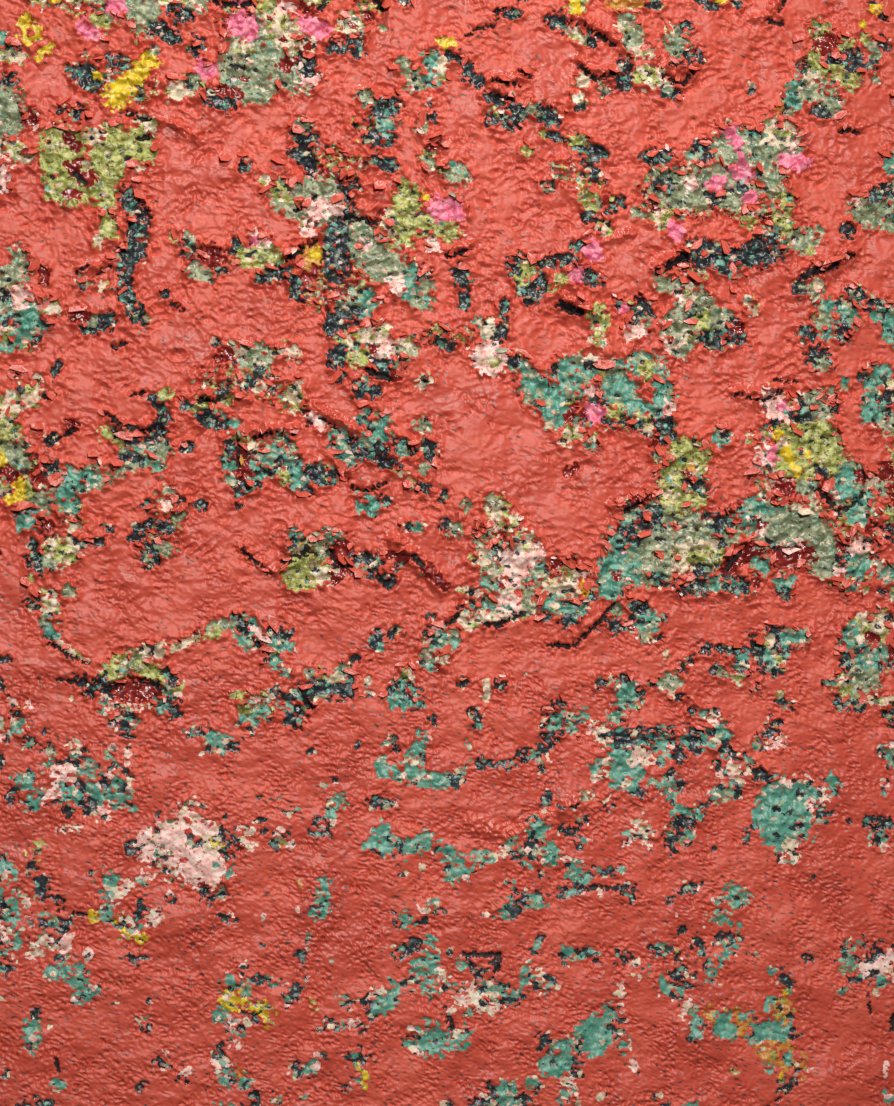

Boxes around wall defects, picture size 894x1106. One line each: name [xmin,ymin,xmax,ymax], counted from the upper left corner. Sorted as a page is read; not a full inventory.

peeling [0,0,894,838]
peeling [361,620,843,920]
peeling [846,814,894,852]
peeling [0,795,302,1006]
peeling [20,1007,53,1057]
peeling [15,1057,67,1106]
peeling [135,997,153,1033]
peeling [135,1049,192,1092]
peeling [210,877,561,1106]
peeling [467,879,814,1106]
peeling [833,932,894,1015]
peeling [882,1061,894,1105]